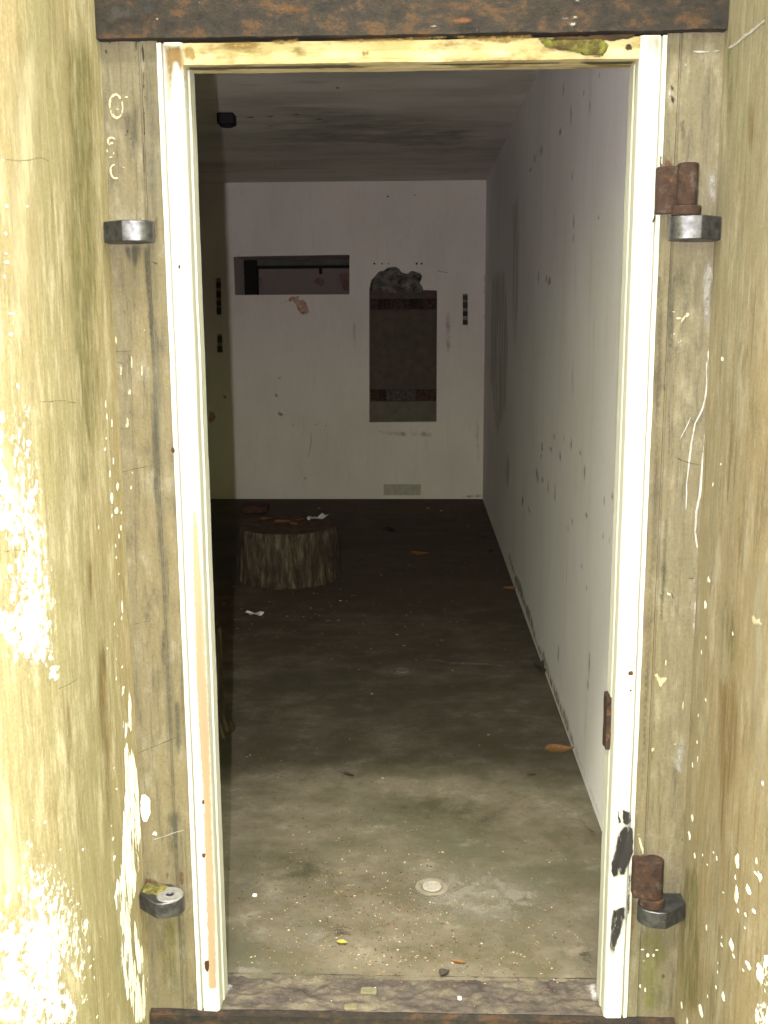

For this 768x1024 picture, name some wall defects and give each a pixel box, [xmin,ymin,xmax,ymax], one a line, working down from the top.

peeling [17,51,36,295]
peeling [0,406,60,680]
peeling [0,841,95,1024]
peeling [107,647,157,1023]